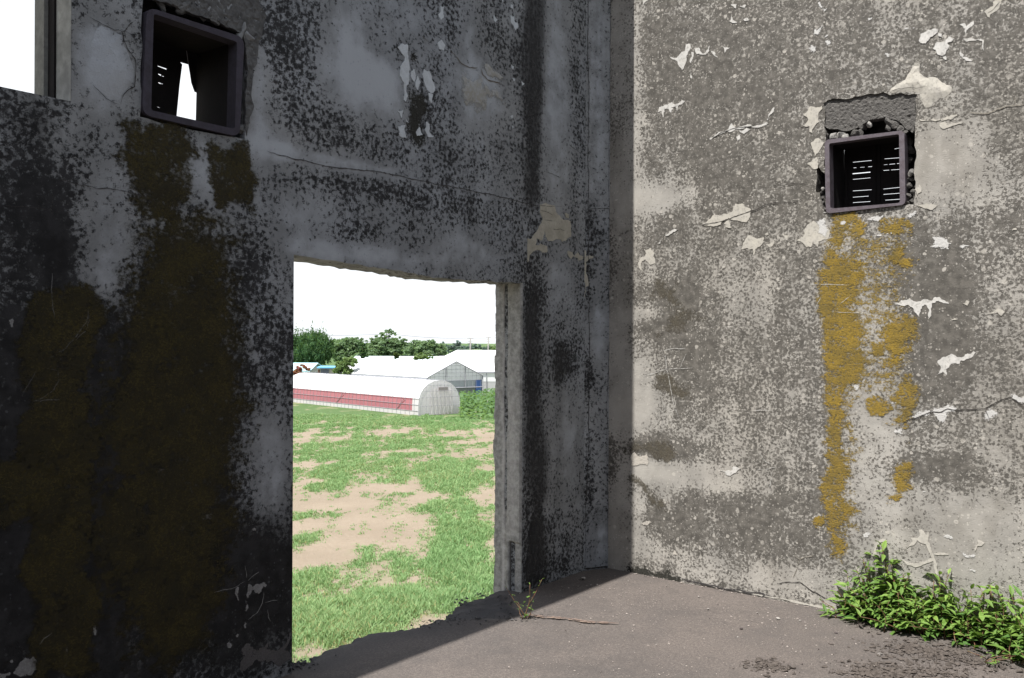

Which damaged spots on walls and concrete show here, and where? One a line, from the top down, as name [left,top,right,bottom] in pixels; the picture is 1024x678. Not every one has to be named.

peeling [670,44,729,78]
peeling [904,0,1002,61]
leakage [111,113,259,226]
peeling [704,204,751,228]
spalling [742,92,968,255]
leakage [0,274,108,678]
crack [268,0,611,570]
leakage [526,296,546,579]
leakage [816,211,921,557]
peeling [897,297,949,318]
peeling [937,351,975,375]
crack [902,397,1024,425]